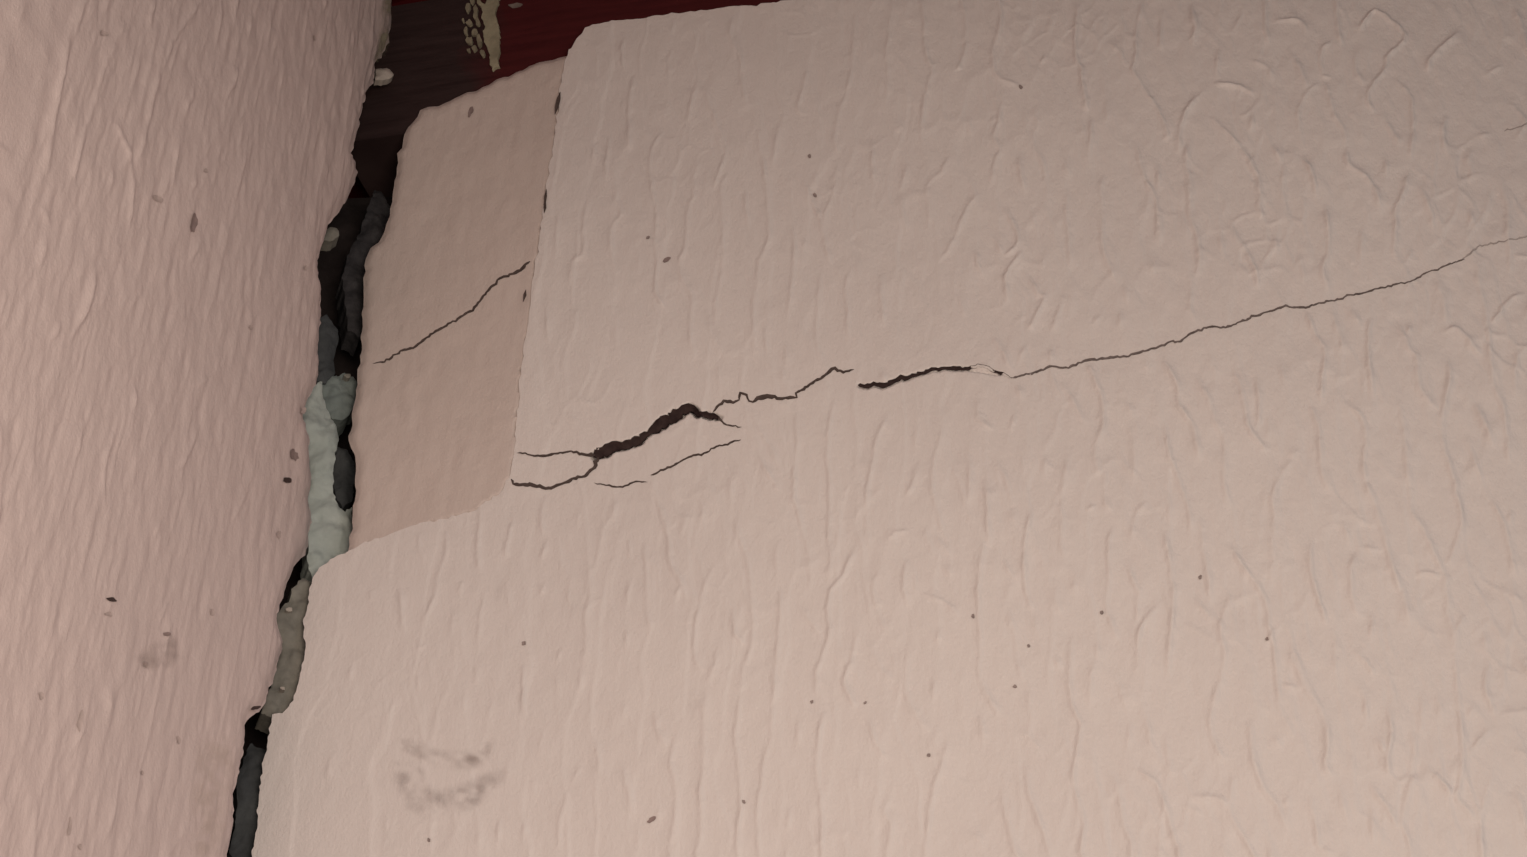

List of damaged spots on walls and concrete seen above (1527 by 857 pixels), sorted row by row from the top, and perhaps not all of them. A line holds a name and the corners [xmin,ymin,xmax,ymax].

crack [554,92,562,114]
crack [511,236,1527,490]
crack [227,190,530,857]